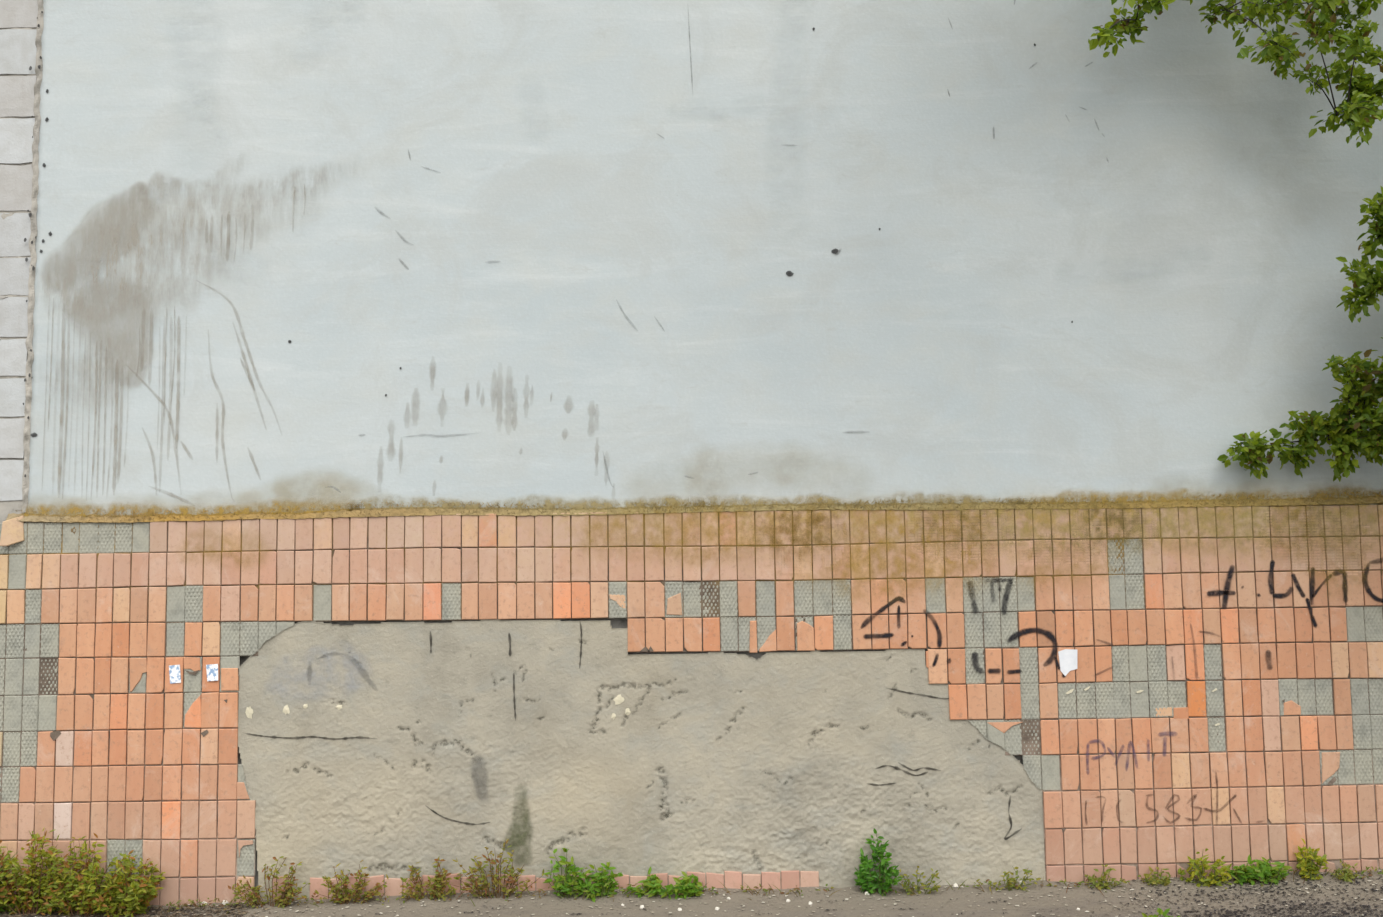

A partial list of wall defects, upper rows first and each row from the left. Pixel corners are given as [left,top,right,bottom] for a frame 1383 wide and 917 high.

peeling [0,522,150,803]
peeling [166,586,203,728]
spalling [220,577,1060,900]
peeling [1058,645,1186,719]
peeling [1107,539,1145,610]
peeling [1203,644,1226,752]
peeling [1278,679,1333,716]
peeling [1319,679,1383,785]
peeling [1346,606,1383,642]